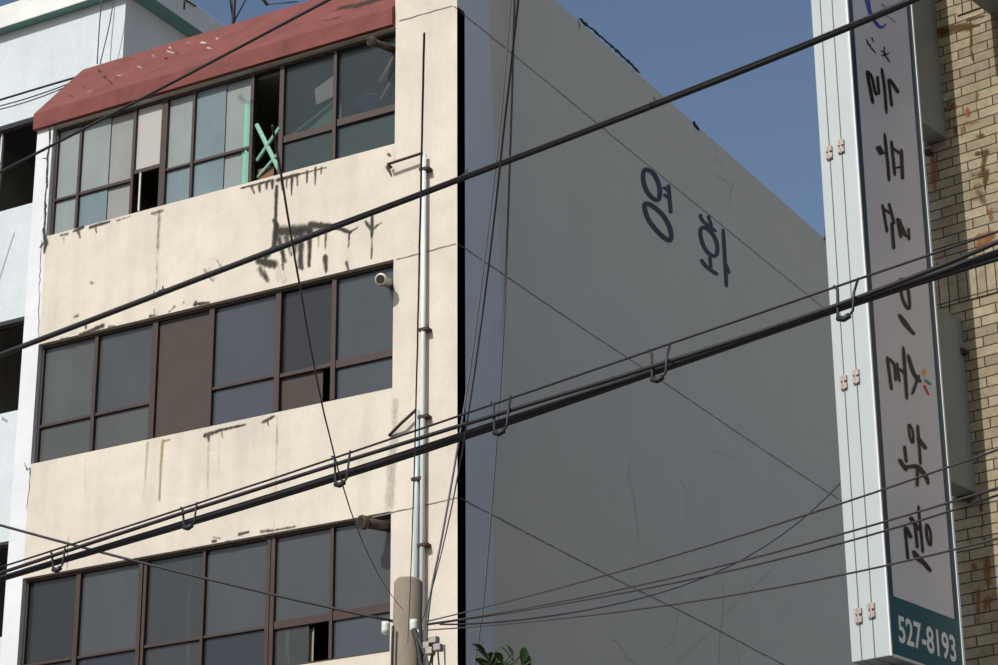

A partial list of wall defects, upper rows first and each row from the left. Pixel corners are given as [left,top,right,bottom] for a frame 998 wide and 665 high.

corrosion [937,15,985,60]
corrosion [975,150,989,201]
leakage [241,167,379,281]
corrosion [976,209,994,247]